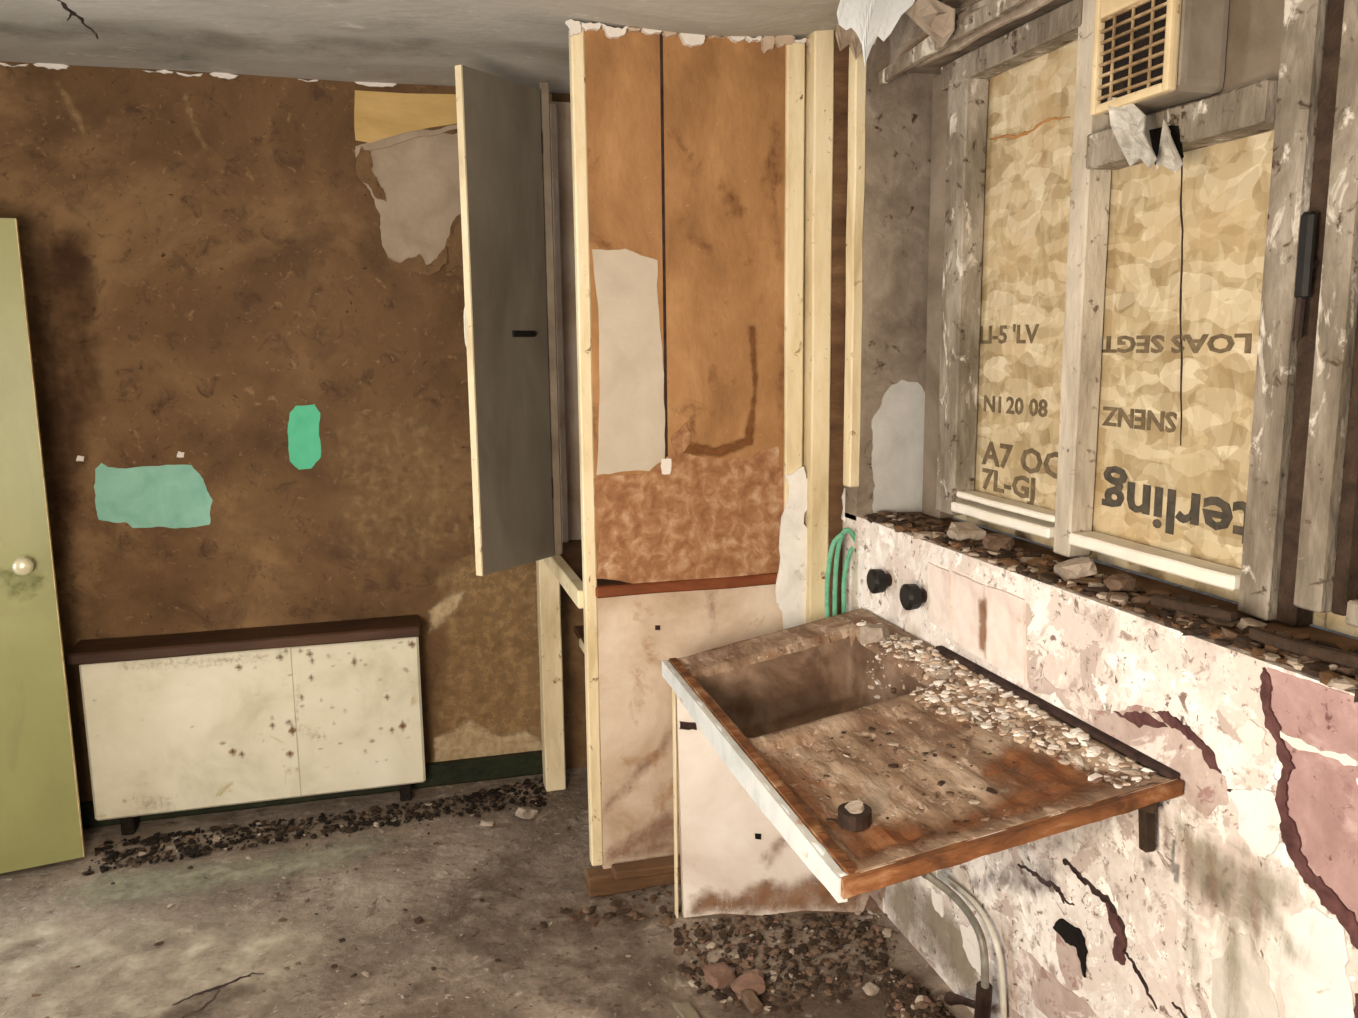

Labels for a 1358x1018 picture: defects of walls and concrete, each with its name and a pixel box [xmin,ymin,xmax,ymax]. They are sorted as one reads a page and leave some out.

peeling [143,69,238,80]
flaking render [354,82,463,276]
peeling [871,379,925,513]
flaking render [1028,667,1358,1018]
flaking render [991,918,1097,1018]